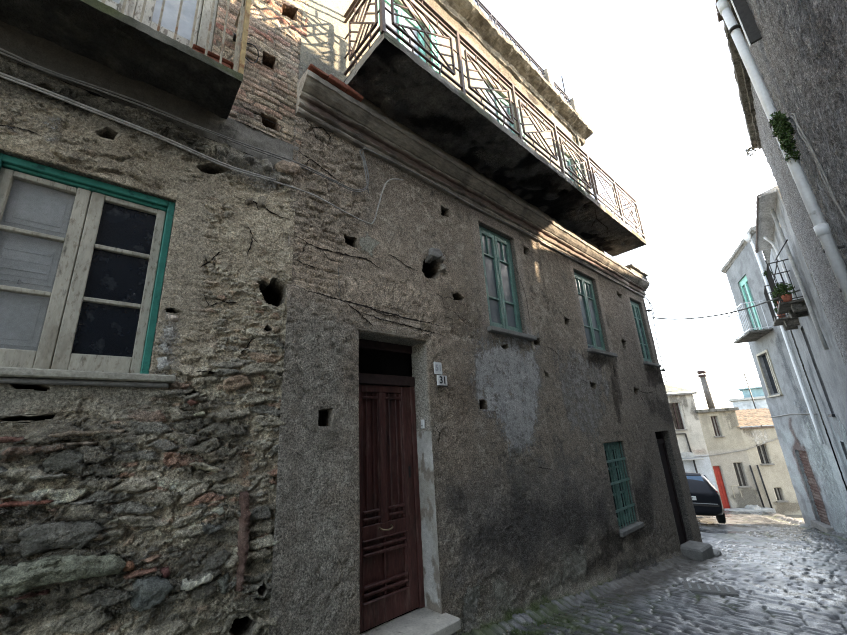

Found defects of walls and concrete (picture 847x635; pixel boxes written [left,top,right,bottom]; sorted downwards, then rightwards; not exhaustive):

crack [236,197,472,336]
hole [0,383,60,393]
spalling [0,411,136,484]
spalling [171,385,248,479]
spalling [0,493,230,629]
hole [221,611,266,635]